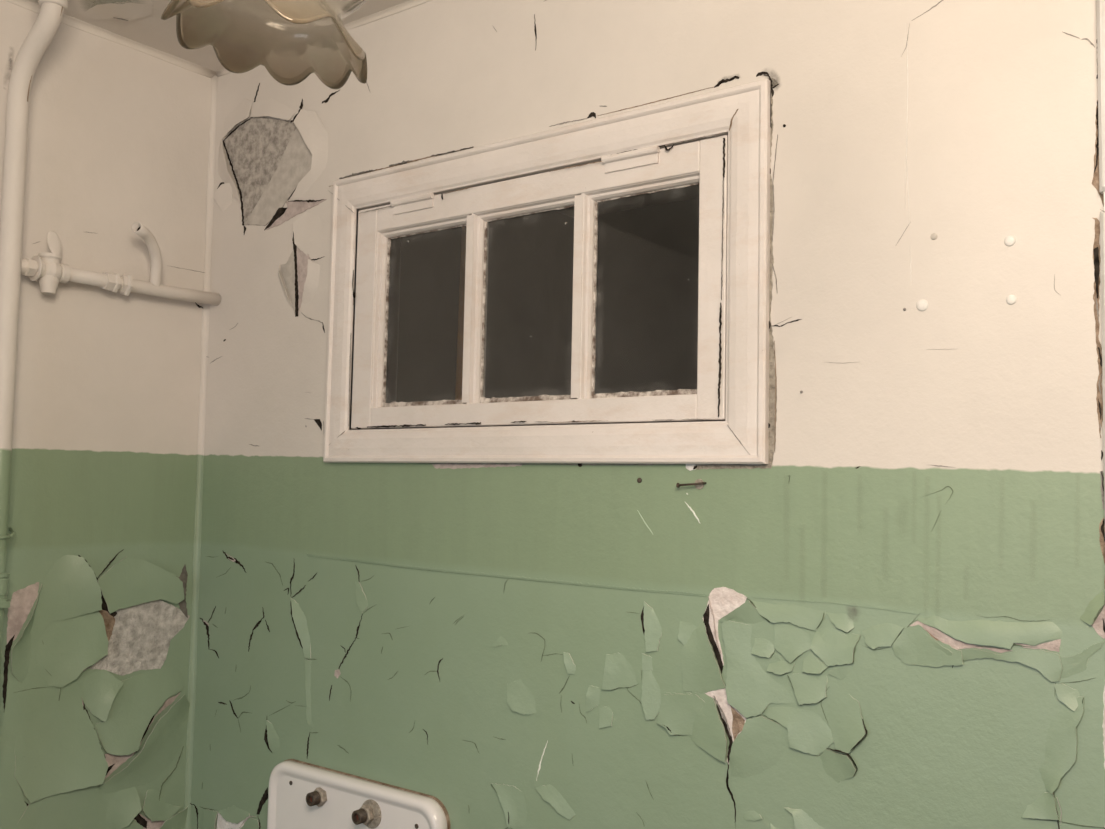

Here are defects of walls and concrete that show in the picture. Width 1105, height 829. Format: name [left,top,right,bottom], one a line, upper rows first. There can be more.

crack [903,0,943,53]
peeling [213,83,474,333]
peeling [329,335,426,445]
crack [207,551,246,577]
peeling [2,549,190,829]
crack [200,606,298,731]
crack [329,567,408,702]
crack [533,633,576,711]
peeling [571,587,1063,829]
crack [190,783,268,829]